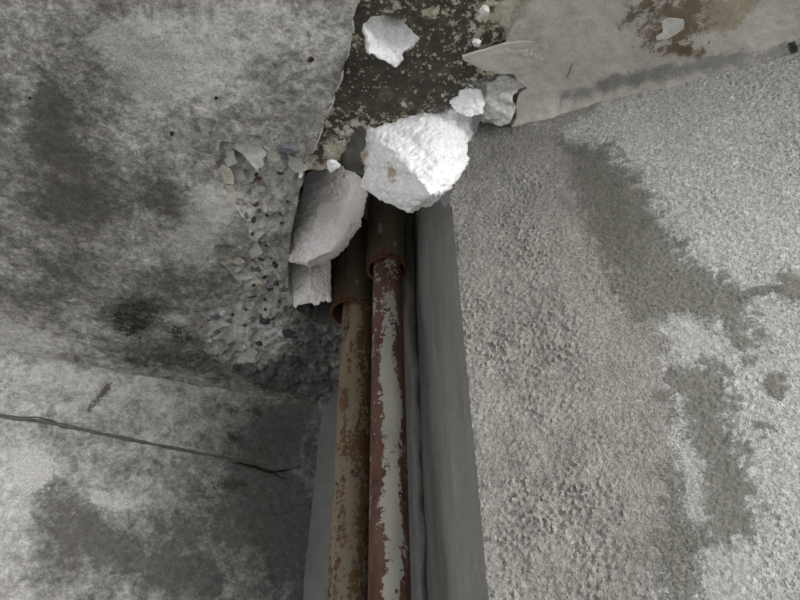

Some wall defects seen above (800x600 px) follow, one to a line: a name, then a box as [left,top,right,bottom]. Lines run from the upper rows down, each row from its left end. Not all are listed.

leakage [83,15,193,105]
spalling [346,15,420,68]
flaking render [462,41,544,75]
spalling [199,122,342,406]
leakage [103,292,218,374]
leakage [576,128,800,600]
crack [0,414,300,479]